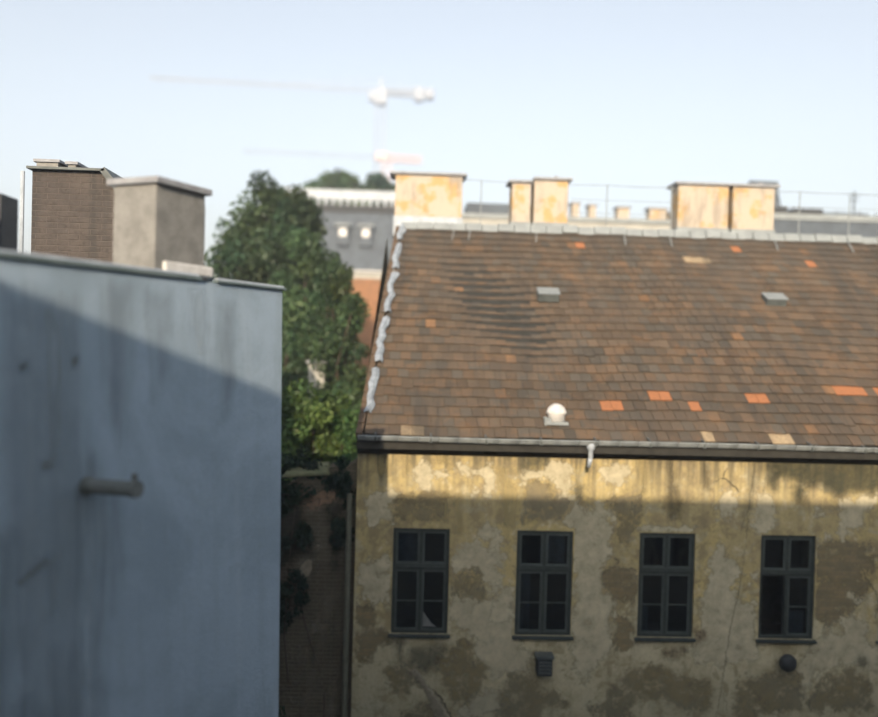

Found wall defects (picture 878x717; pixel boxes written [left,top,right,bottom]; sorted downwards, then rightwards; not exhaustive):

peeling [355,553,393,666]
peeling [437,518,569,717]
peeling [363,456,698,687]
spalling [587,662,712,717]
peeling [685,541,760,670]
crack [713,464,754,717]
peeling [749,485,779,536]
peeling [733,614,878,717]
damp [770,463,878,502]
peeling [814,492,878,548]